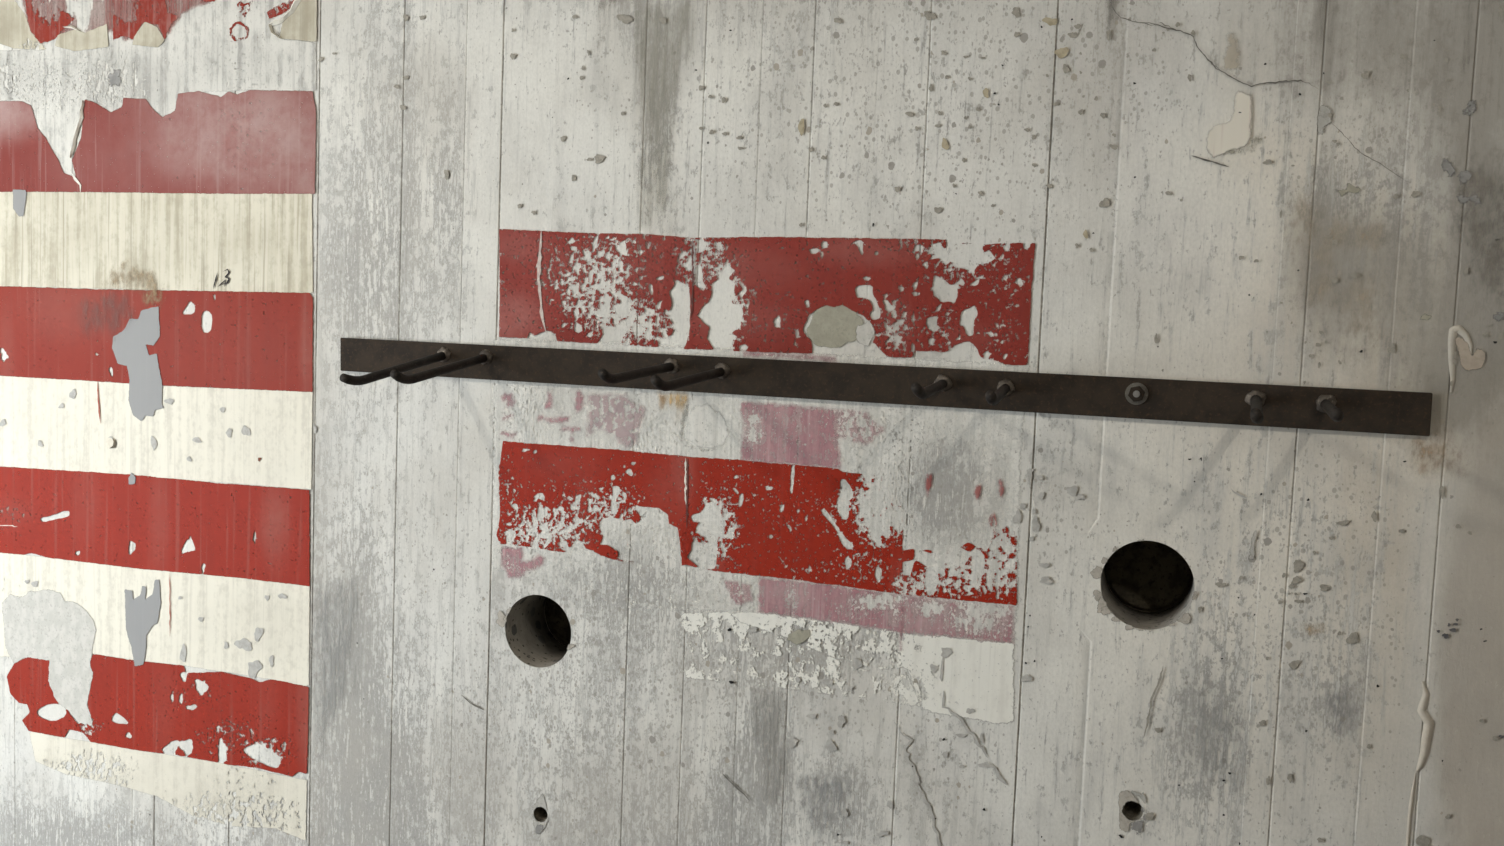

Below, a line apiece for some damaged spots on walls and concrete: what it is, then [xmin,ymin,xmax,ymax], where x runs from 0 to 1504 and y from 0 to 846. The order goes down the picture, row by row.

crack [1110,4,1315,87]
peeling [0,0,337,176]
spalling [744,305,875,359]
peeling [220,407,251,438]
peeling [599,545,618,558]
peeling [680,521,705,565]
peeling [2,580,307,840]